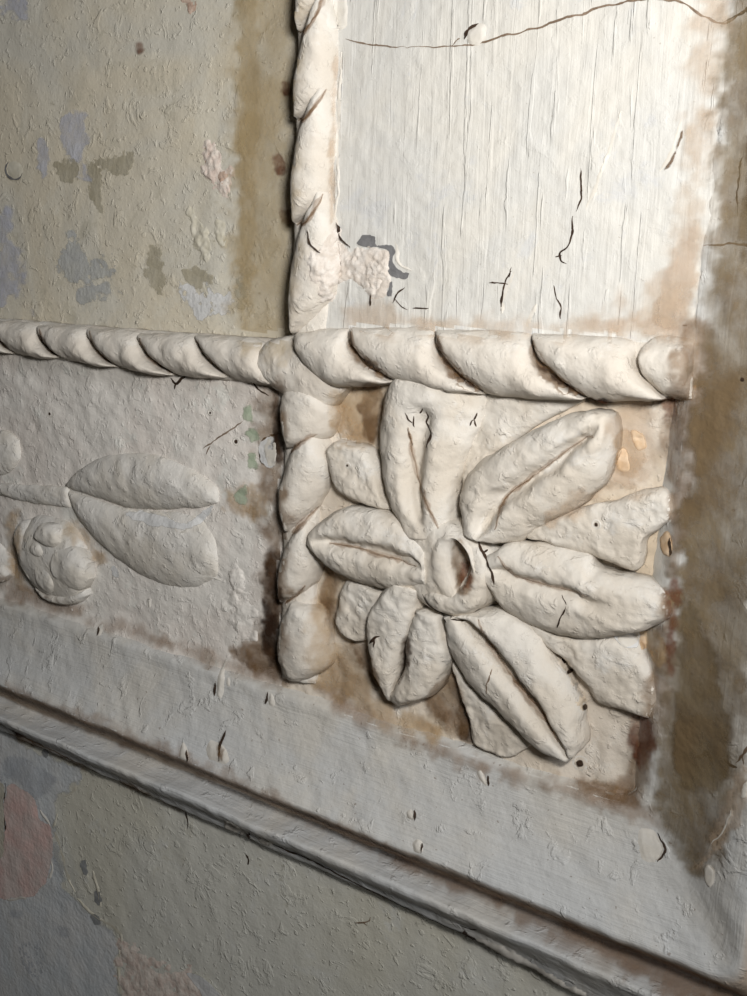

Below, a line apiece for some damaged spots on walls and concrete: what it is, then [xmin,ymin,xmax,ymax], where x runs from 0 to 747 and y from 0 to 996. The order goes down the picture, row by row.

crack [347,0,747,48]
spalling [306,52,411,306]
peeling [0,725,123,996]
spalling [223,820,273,846]
spalling [460,930,586,996]